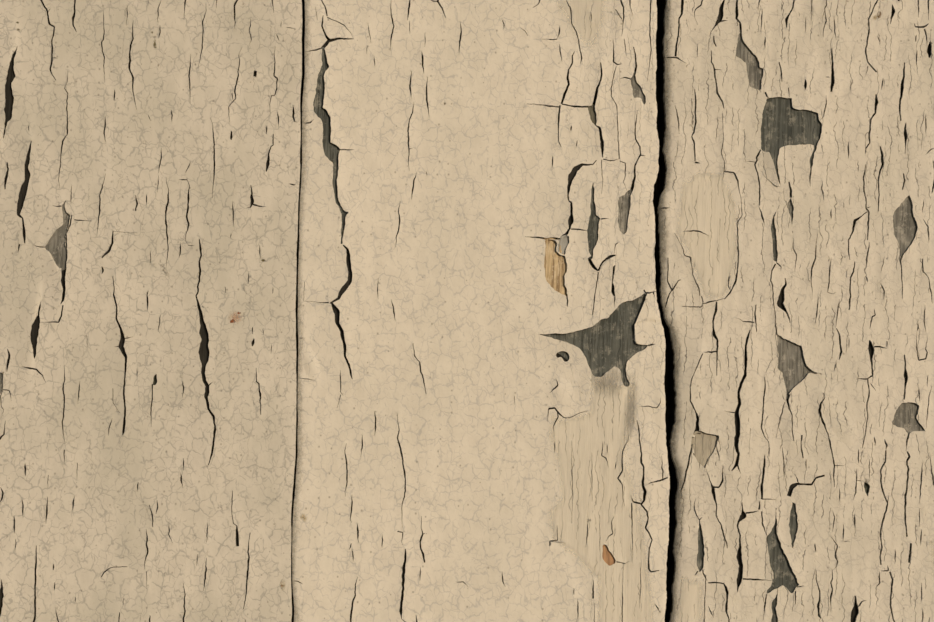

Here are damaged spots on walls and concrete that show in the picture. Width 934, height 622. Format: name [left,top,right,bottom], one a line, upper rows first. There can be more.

crack [4,127,31,252]
crack [97,178,138,435]
crack [135,152,216,465]
peeling [313,17,352,378]
crack [344,412,425,622]
peeling [543,290,656,622]
crack [613,0,724,163]
peeling [735,0,822,203]
peeling [764,516,801,608]
peeling [776,333,817,420]
crack [704,0,934,622]
peeling [893,196,917,281]